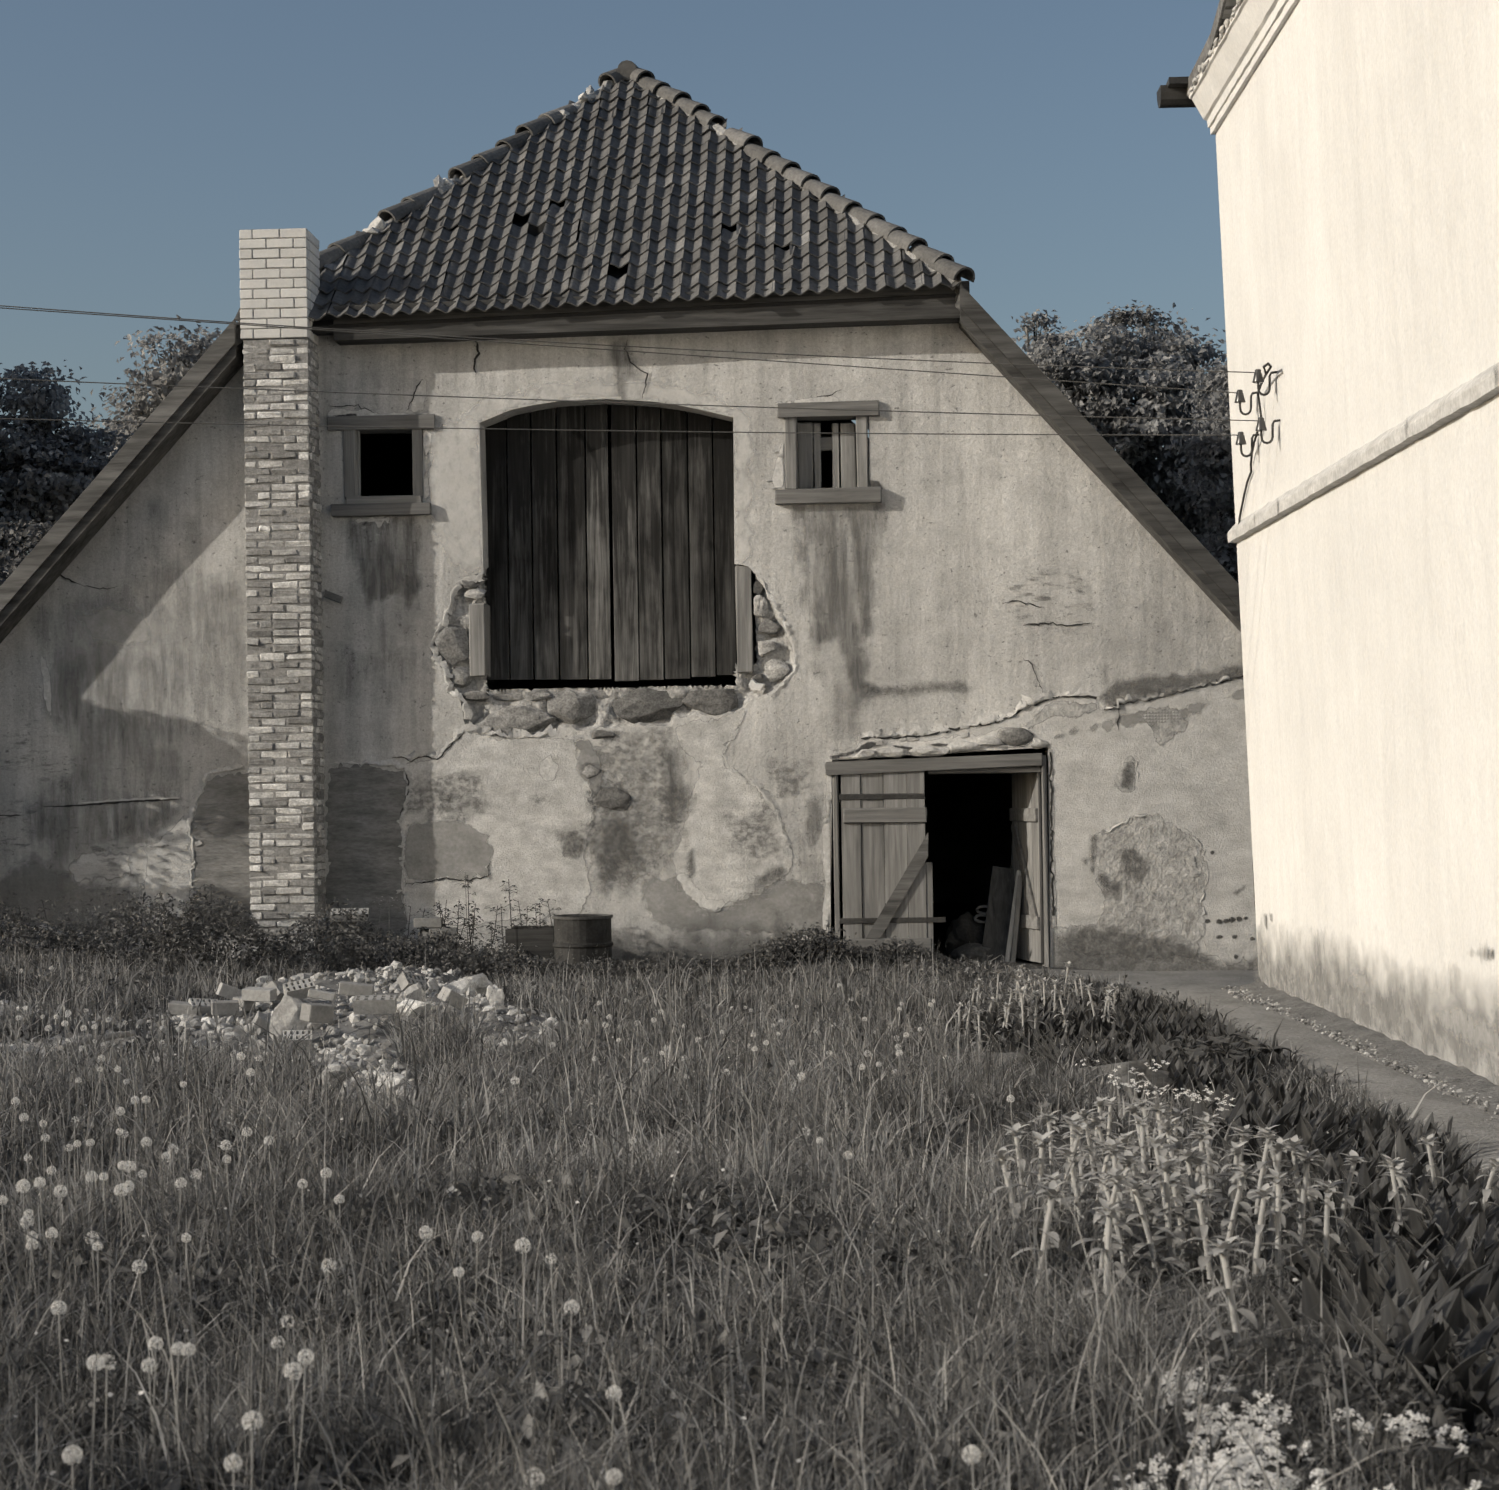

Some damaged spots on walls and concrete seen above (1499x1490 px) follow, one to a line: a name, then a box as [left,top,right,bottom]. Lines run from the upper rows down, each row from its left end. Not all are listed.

damp [350,519,419,600]
damp [804,508,964,694]
crack [44,797,179,807]
peeling [69,763,249,927]
damp [590,735,684,883]
peeling [328,564,1258,966]